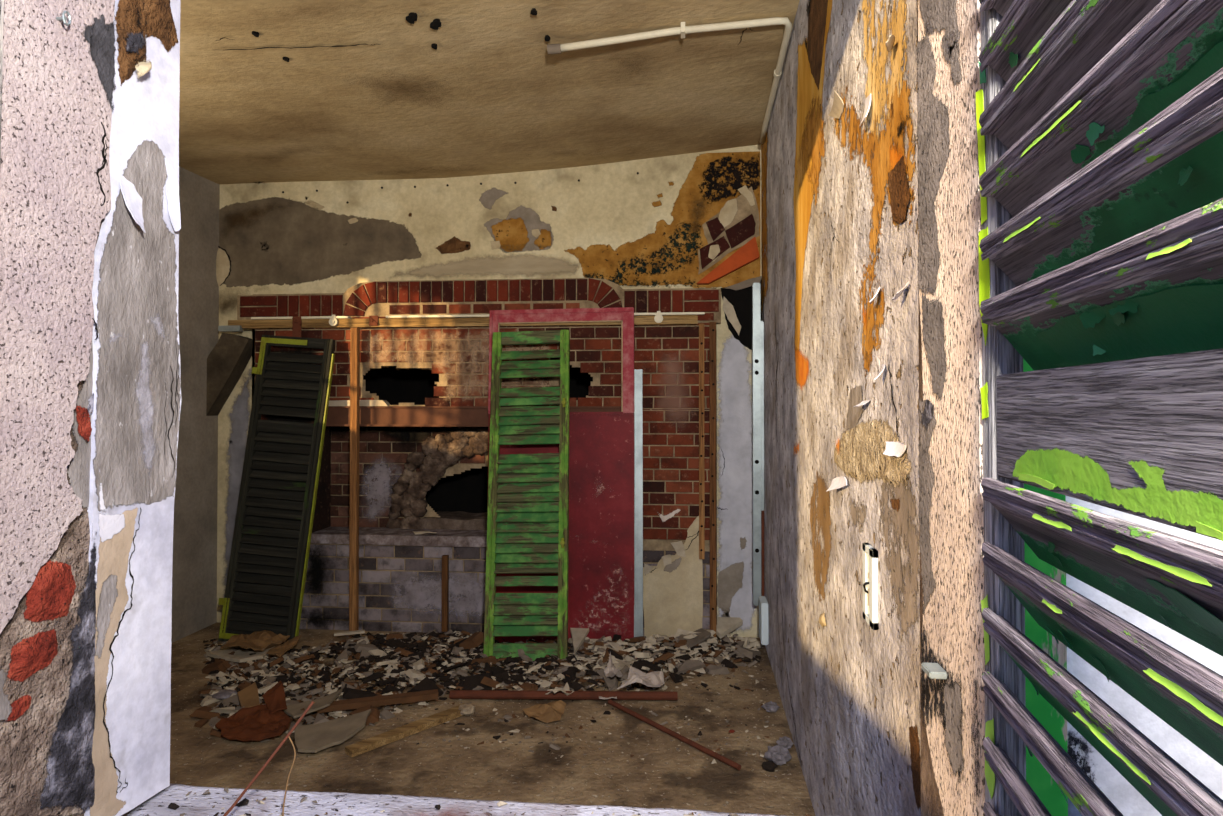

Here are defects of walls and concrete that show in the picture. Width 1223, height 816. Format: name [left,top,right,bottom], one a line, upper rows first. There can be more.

spalling [84,0,178,110]
peeling [0,140,181,816]
peeling [219,131,768,350]
peeling [796,0,962,642]
peeling [976,62,990,346]
peeling [980,382,988,419]
peeling [981,595,990,665]